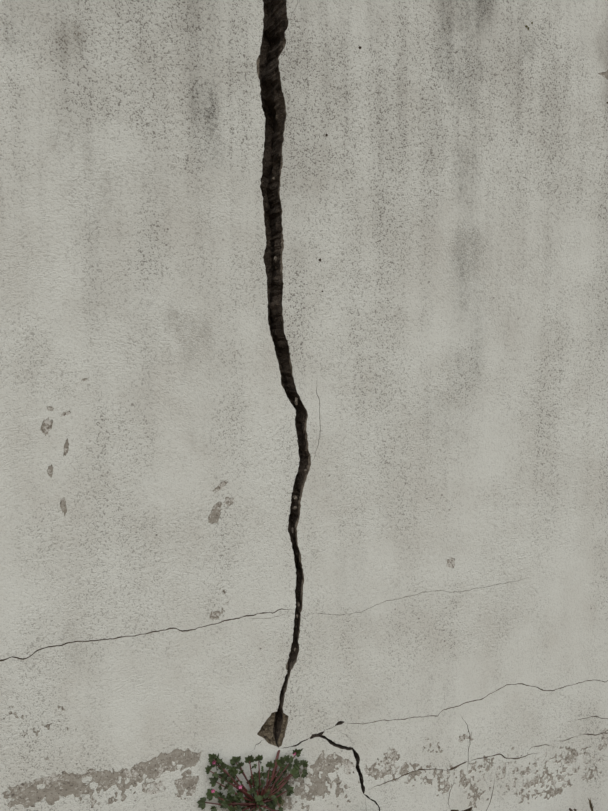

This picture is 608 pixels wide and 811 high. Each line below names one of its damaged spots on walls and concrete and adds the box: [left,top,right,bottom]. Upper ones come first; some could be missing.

peeling [40,406,71,436]
crack [0,0,443,811]
peeling [3,706,68,738]
peeling [2,748,203,809]
peeling [268,728,608,811]
crack [425,680,608,717]
crack [449,718,607,770]